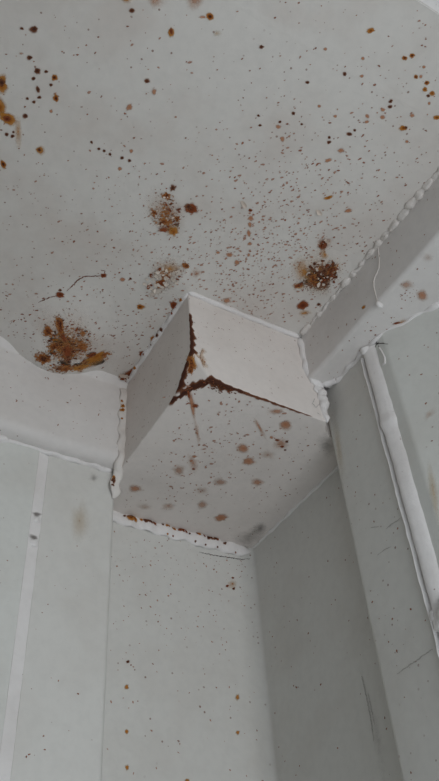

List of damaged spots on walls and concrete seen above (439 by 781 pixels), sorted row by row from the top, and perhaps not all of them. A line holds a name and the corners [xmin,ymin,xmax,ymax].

rust [0,68,28,135]
crack [38,270,106,303]
rust [152,313,310,510]
rust [123,515,227,549]